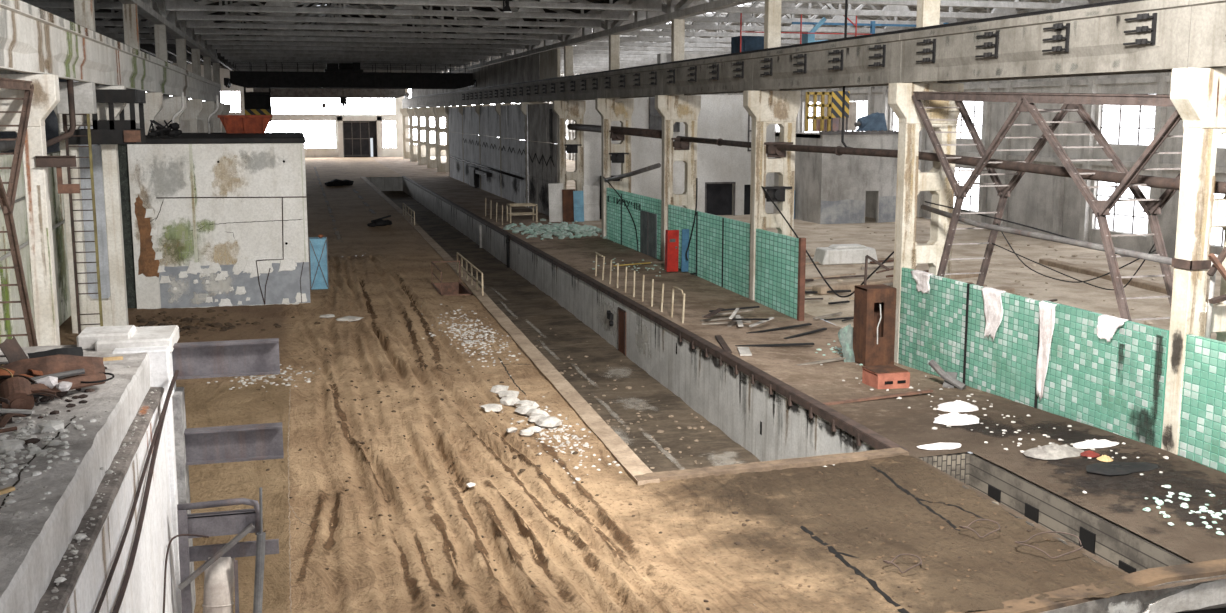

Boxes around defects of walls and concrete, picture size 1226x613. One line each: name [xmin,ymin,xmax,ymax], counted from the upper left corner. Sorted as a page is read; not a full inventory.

leakage [9,0,18,68]
peeling [133,187,297,306]
peeling [282,292,307,304]
crack [871,466,984,531]
crack [800,526,910,613]